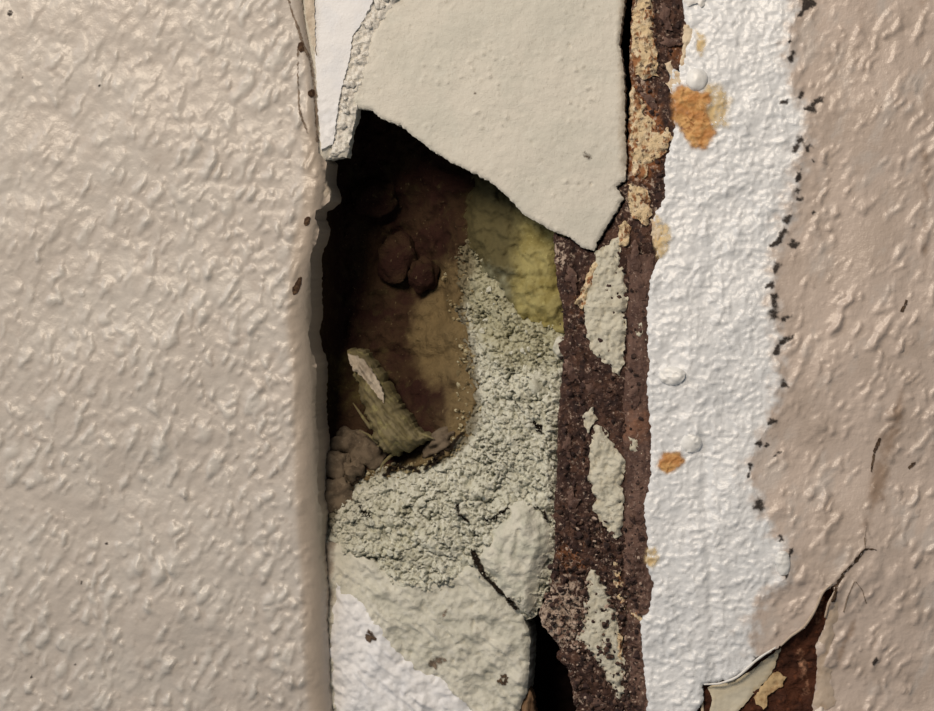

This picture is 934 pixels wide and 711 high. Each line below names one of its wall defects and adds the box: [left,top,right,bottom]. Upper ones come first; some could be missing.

peeling [665,25,693,92]
corrosion [671,85,726,149]
corrosion [654,215,670,257]
peeling [292,277,302,295]
corrosion [634,273,647,300]
spalling [319,110,565,620]
corrosion [658,452,685,473]
corrosion [632,501,645,525]